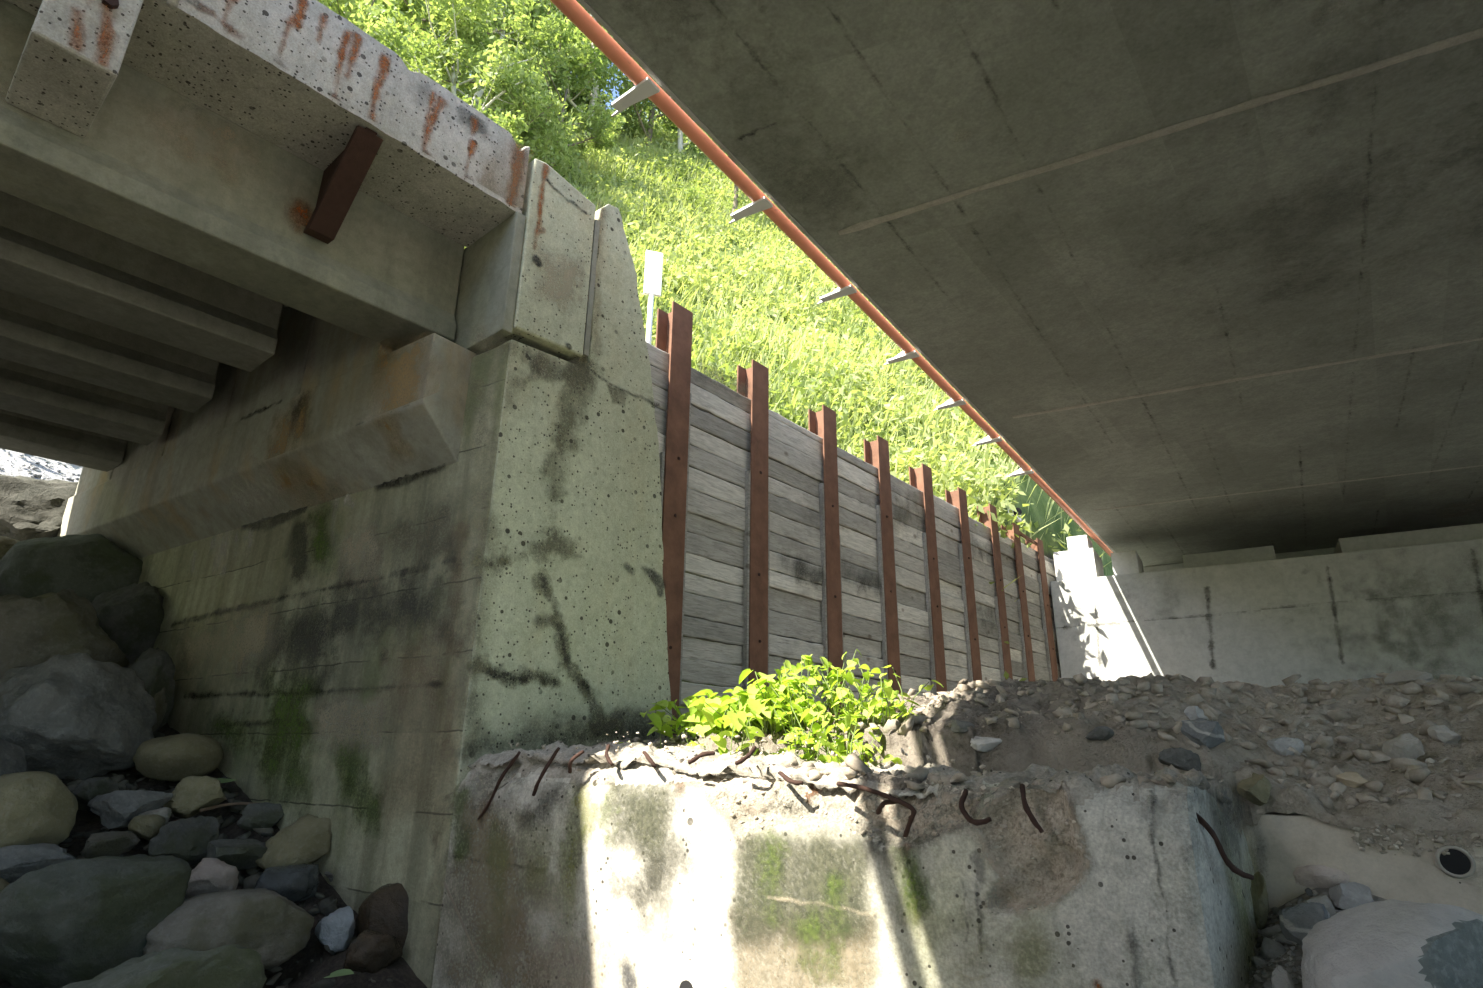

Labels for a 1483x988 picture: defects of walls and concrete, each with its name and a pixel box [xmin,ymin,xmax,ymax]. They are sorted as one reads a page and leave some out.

corrosion [282,0,326,47]
corrosion [337,31,362,77]
corrosion [370,54,390,122]
corrosion [423,92,446,155]
corrosion [466,119,478,179]
water stain [530,352,593,502]
water stain [532,529,573,556]
water stain [181,487,510,825]
water stain [441,783,681,988]
spalling [473,728,1090,912]
water stain [732,835,875,988]
crack [1150,790,1163,895]